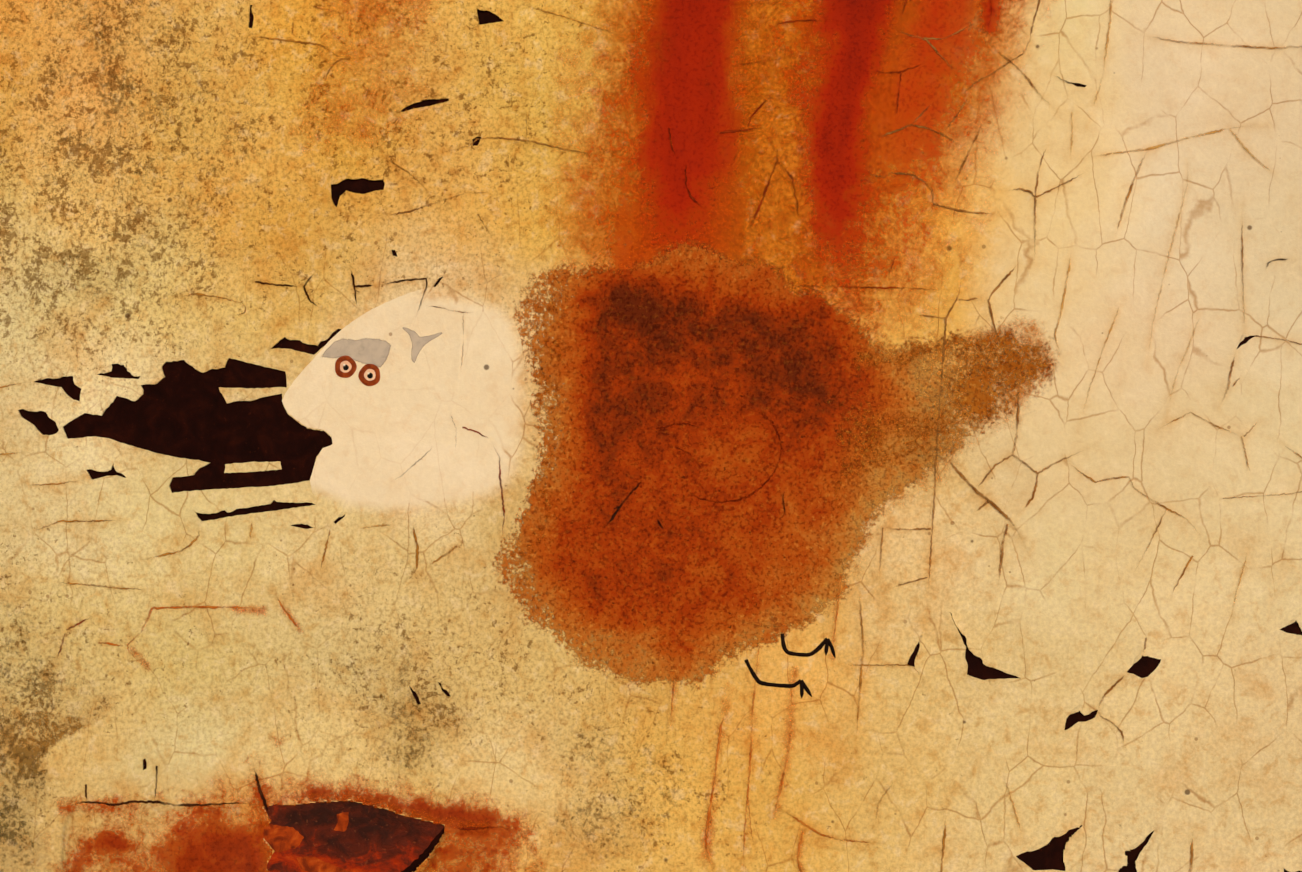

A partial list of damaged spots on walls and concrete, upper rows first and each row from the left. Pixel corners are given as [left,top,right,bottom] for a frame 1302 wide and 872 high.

crack [885,0,1040,173]
peeling [330,175,387,207]
crack [1016,139,1074,218]
crack [1241,237,1286,271]
rust [493,0,1052,689]
peeling [19,357,332,529]
crack [845,258,1127,585]
peeling [950,612,1019,680]
peeling [1127,652,1161,678]
crack [1103,677,1124,740]
rust [56,778,543,872]
peeling [1016,825,1082,871]